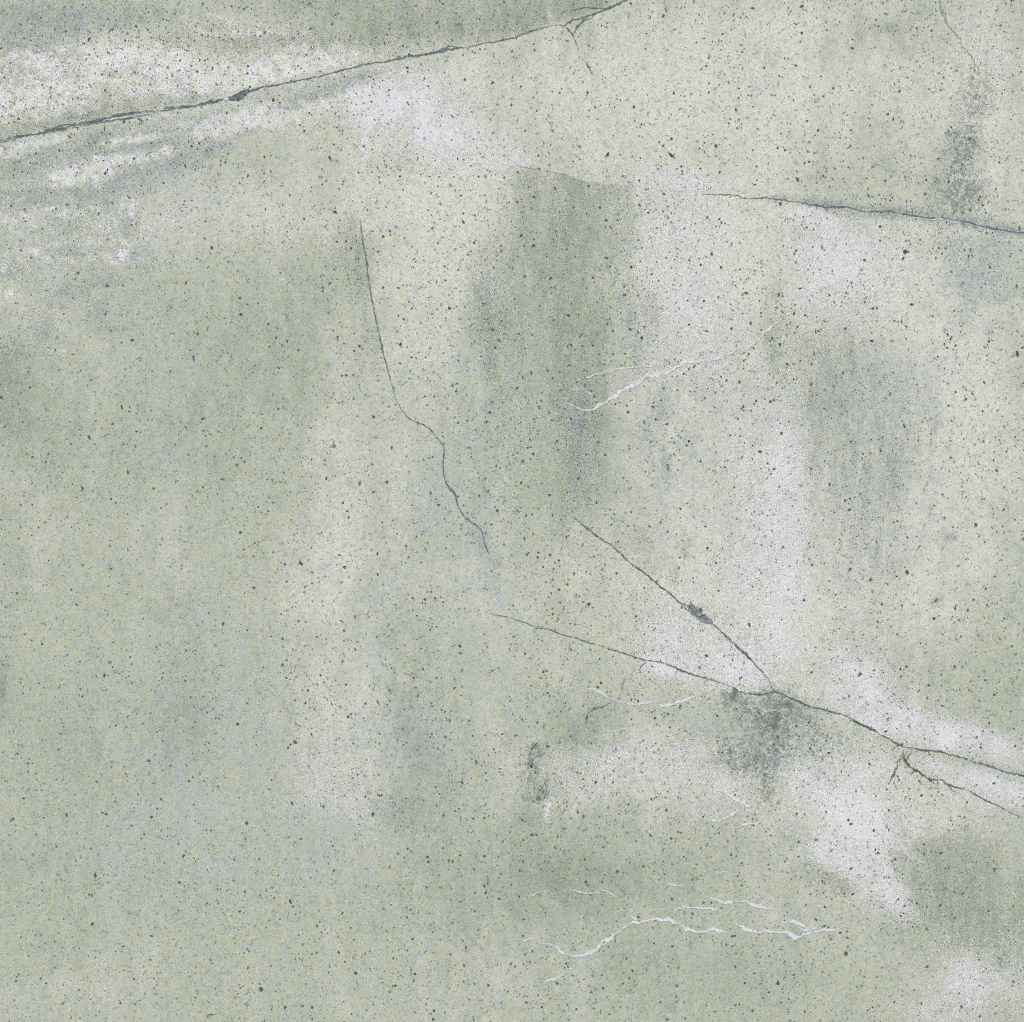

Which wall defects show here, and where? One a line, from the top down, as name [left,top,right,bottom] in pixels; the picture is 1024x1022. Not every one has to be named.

crack [0,0,627,142]
crack [659,189,1024,241]
crack [360,220,490,554]
crack [485,517,1024,815]